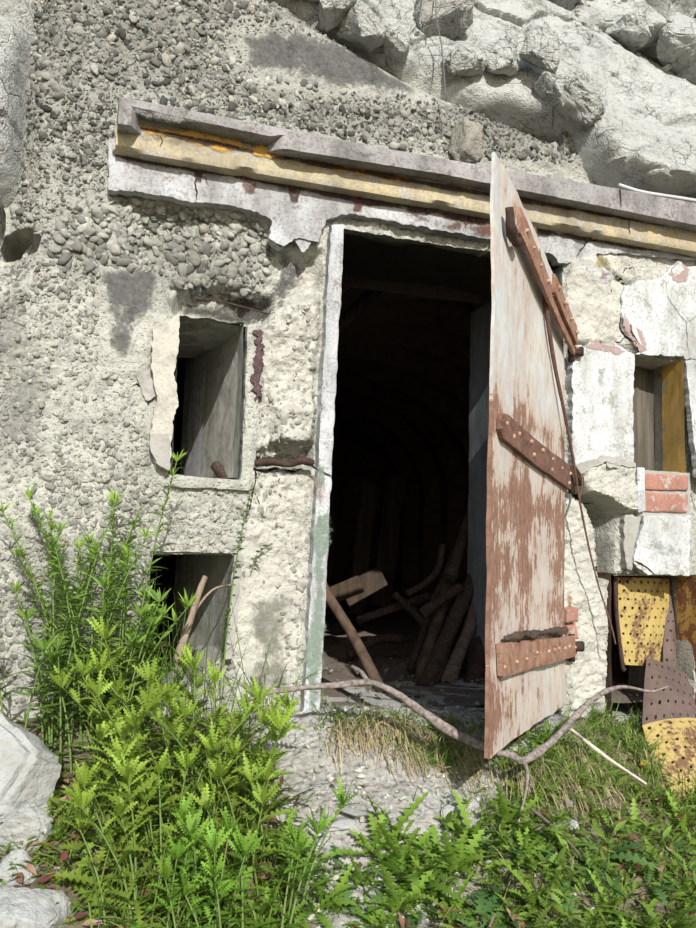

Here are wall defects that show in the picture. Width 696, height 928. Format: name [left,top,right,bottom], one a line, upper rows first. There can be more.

damp [104,270,156,352]
spalling [0,0,582,472]
corrosion [112,149,491,236]
corrosion [140,126,490,196]
corrosion [519,197,665,226]
spalling [565,255,647,354]
corrosion [537,229,692,257]
peeling [668,261,690,283]
corrosion [250,329,265,400]
corrosion [255,456,314,467]